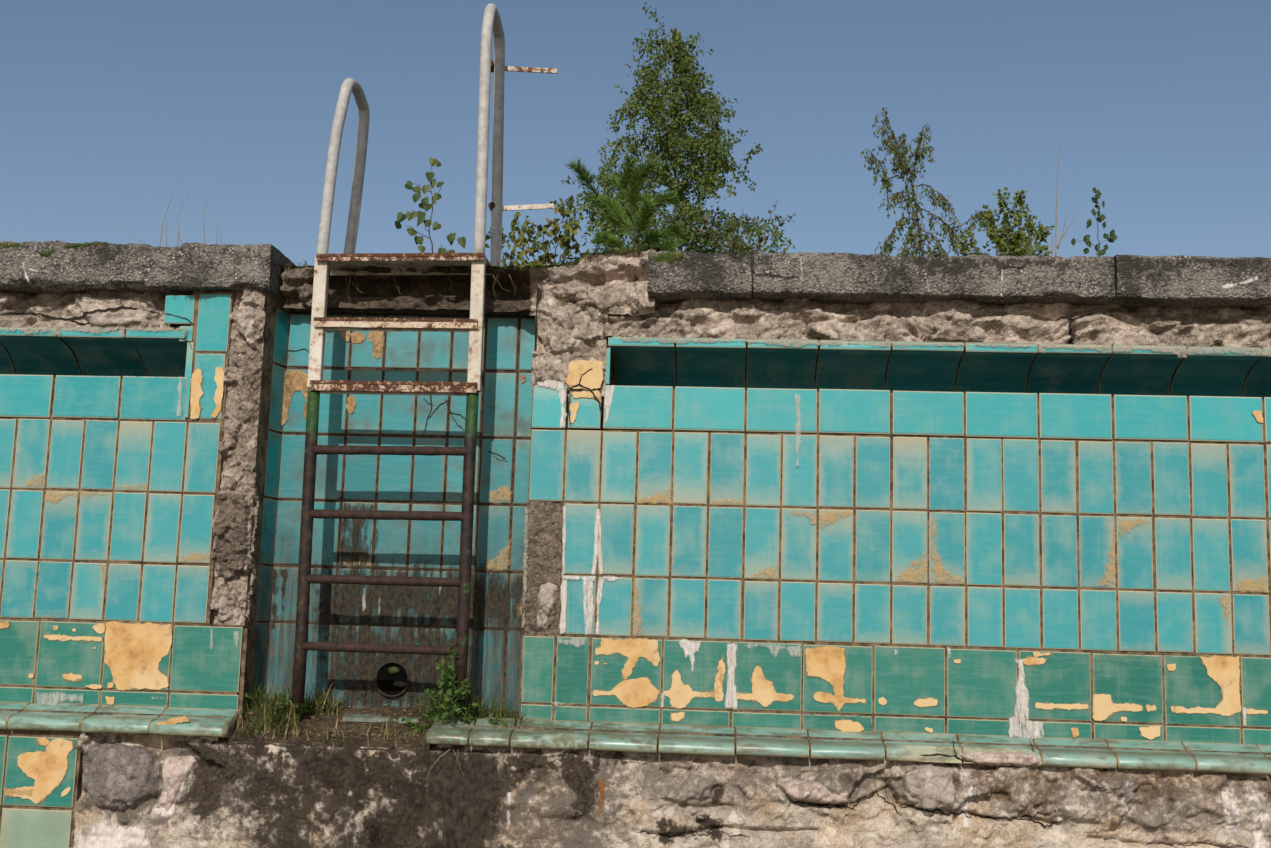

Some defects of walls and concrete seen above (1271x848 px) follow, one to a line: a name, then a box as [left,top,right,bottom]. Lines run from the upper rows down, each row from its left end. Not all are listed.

crack [1,277,193,346]
crack [1061,313,1093,344]
water stain [246,461,259,619]
water stain [271,568,287,629]
water stain [314,498,528,708]
peeling [43,620,172,705]
peeling [591,637,794,722]
peeling [804,645,887,732]
peeling [1035,654,1268,740]
spalling [4,736,197,811]
water stain [74,733,132,750]
water stain [74,736,239,848]